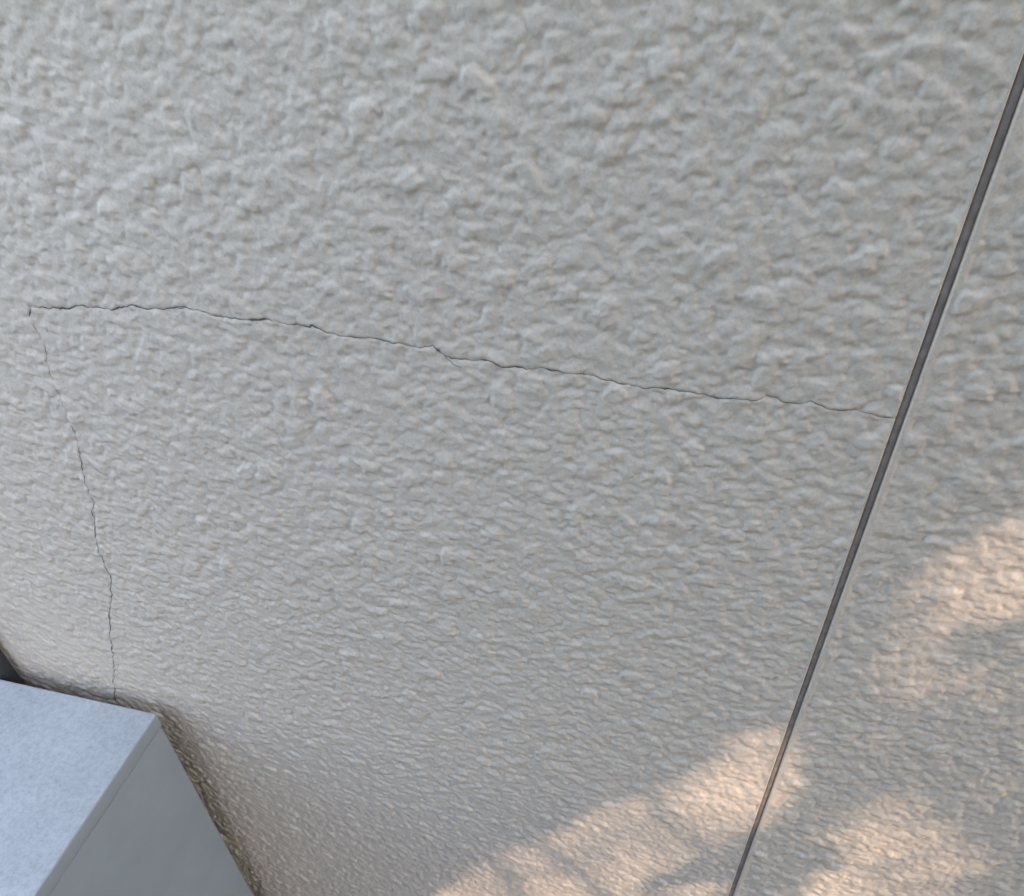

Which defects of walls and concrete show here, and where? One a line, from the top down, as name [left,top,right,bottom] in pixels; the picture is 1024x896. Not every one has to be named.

crack [29,304,887,700]